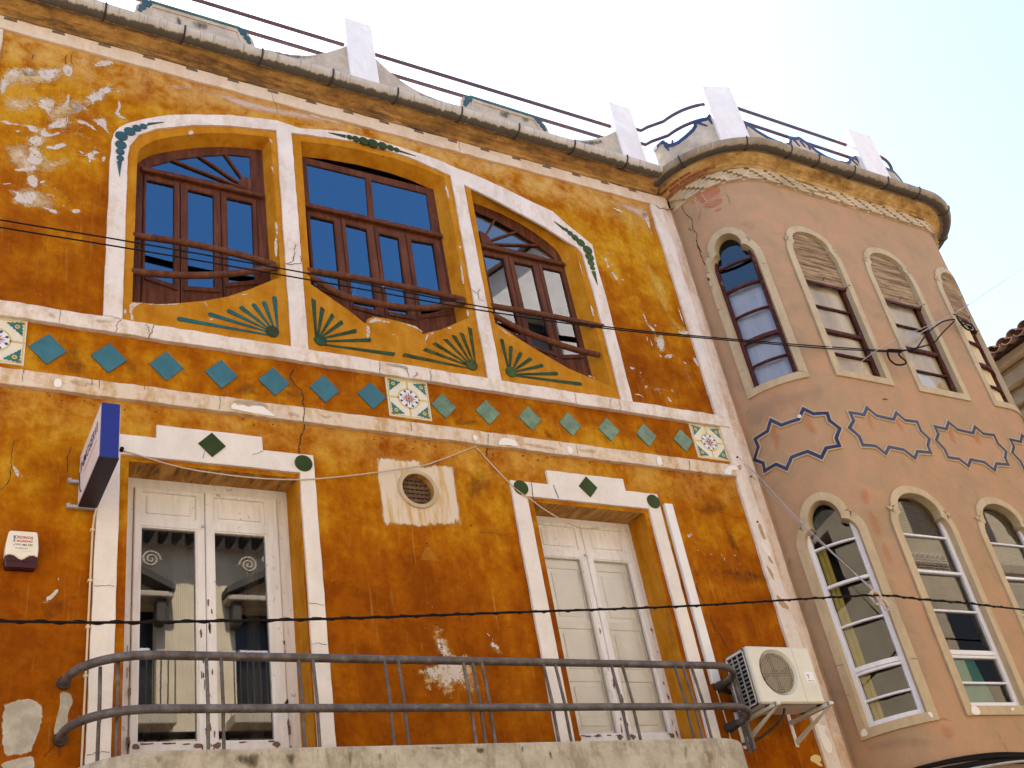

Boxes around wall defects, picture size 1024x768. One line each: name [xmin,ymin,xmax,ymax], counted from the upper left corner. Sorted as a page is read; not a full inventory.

peeling [0,59,126,213]
crack [657,192,729,273]
peeling [643,314,672,358]
crack [290,369,305,454]
peeling [419,630,473,694]